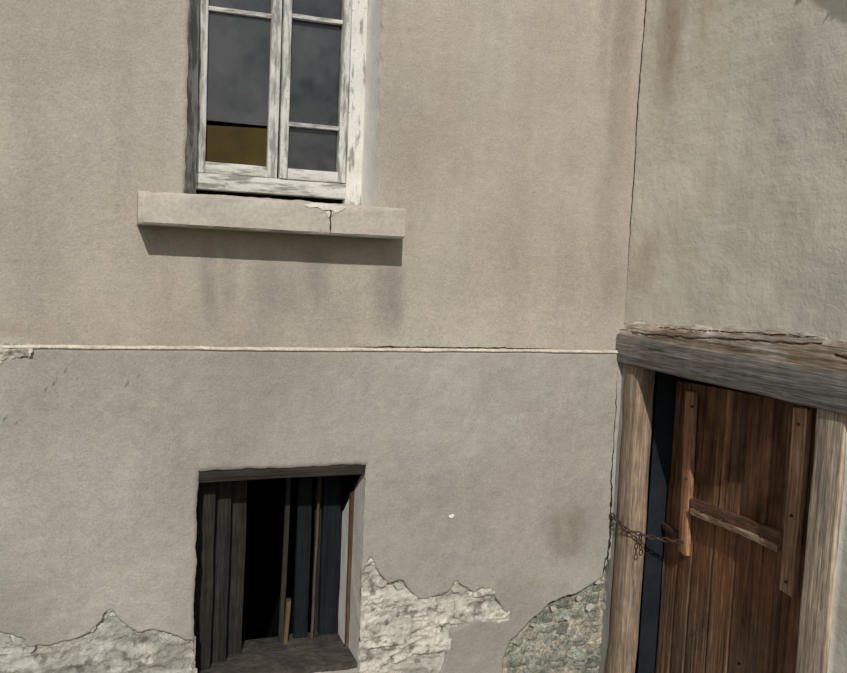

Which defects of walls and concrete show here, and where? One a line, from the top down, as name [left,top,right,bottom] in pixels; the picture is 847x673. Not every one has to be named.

peeling [0,343,33,364]
crack [603,371,618,576]
flaking render [0,609,197,673]
flaking render [358,558,510,673]
flaking render [502,569,606,673]